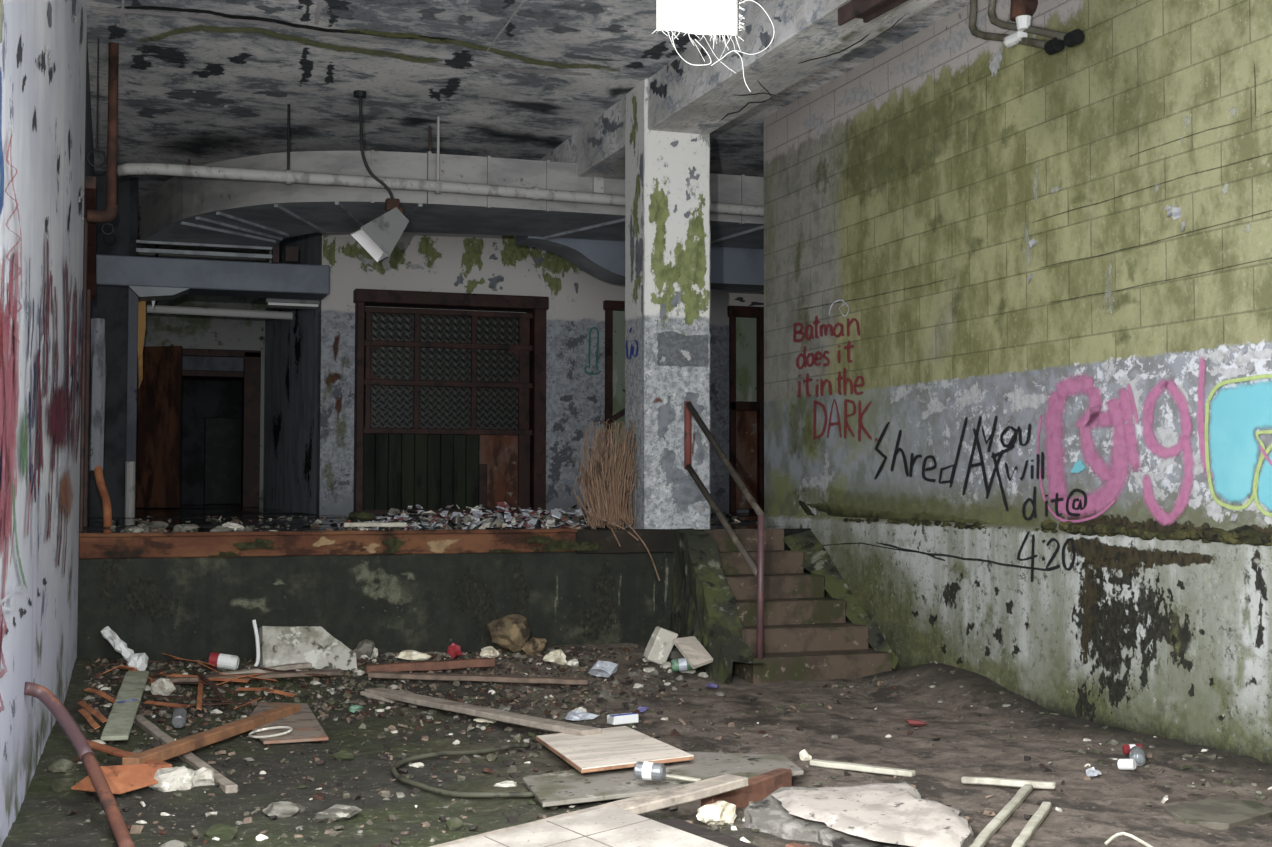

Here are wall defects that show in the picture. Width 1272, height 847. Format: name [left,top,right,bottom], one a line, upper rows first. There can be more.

peeling [219,0,285,14]
peeling [366,0,628,34]
peeling [745,16,782,51]
peeling [130,42,287,118]
peeling [564,34,707,99]
peeling [588,110,624,148]
peeling [673,166,700,218]
peeling [488,254,504,291]
water stain [1250,524,1272,534]
crack [823,542,1046,571]
water stain [1061,511,1215,722]